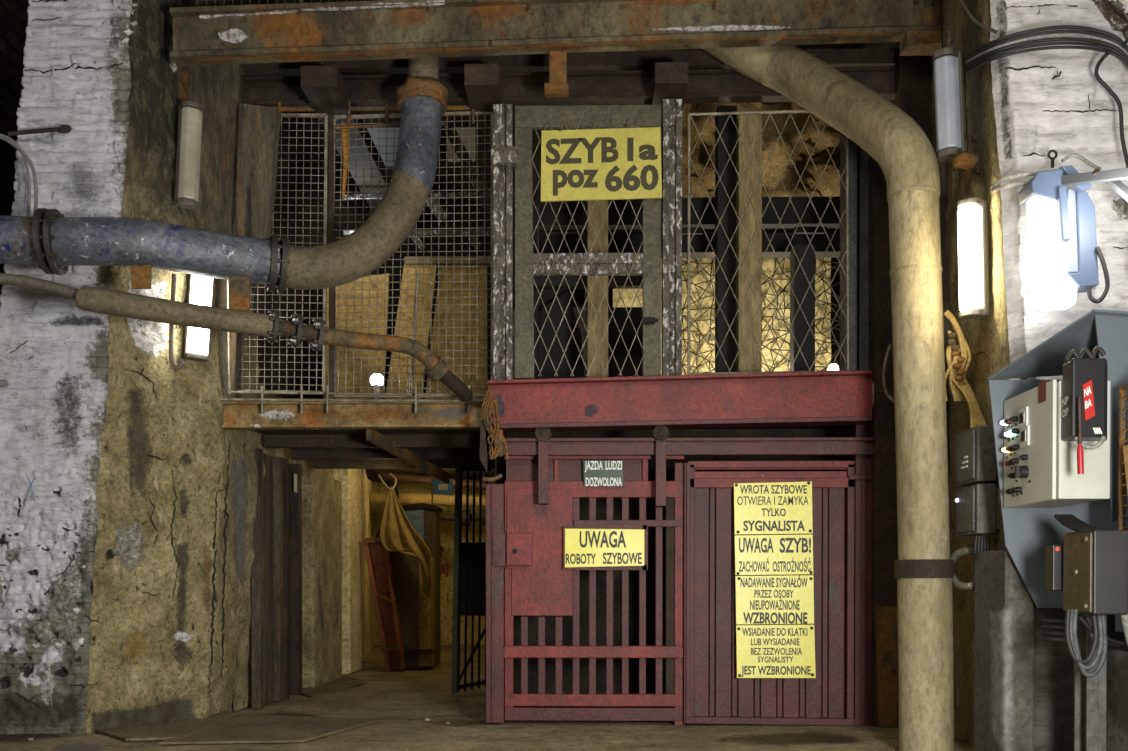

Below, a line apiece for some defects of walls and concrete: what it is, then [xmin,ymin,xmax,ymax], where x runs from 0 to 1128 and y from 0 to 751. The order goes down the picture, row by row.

crack [24,63,122,74]
damp [53,374,81,455]
spalling [0,528,86,689]
crack [208,440,231,697]